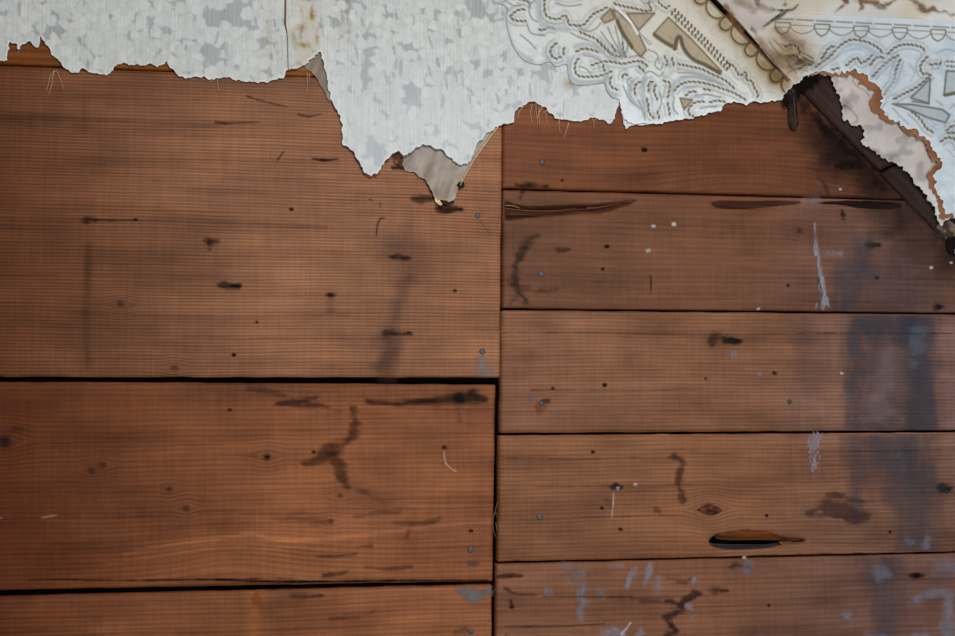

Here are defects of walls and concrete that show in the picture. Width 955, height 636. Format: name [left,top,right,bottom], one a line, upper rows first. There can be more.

spalling [505,200,637,220]
spalling [712,201,801,209]
spalling [818,201,902,209]
spalling [936,220,955,255]
damp [807,493,869,524]